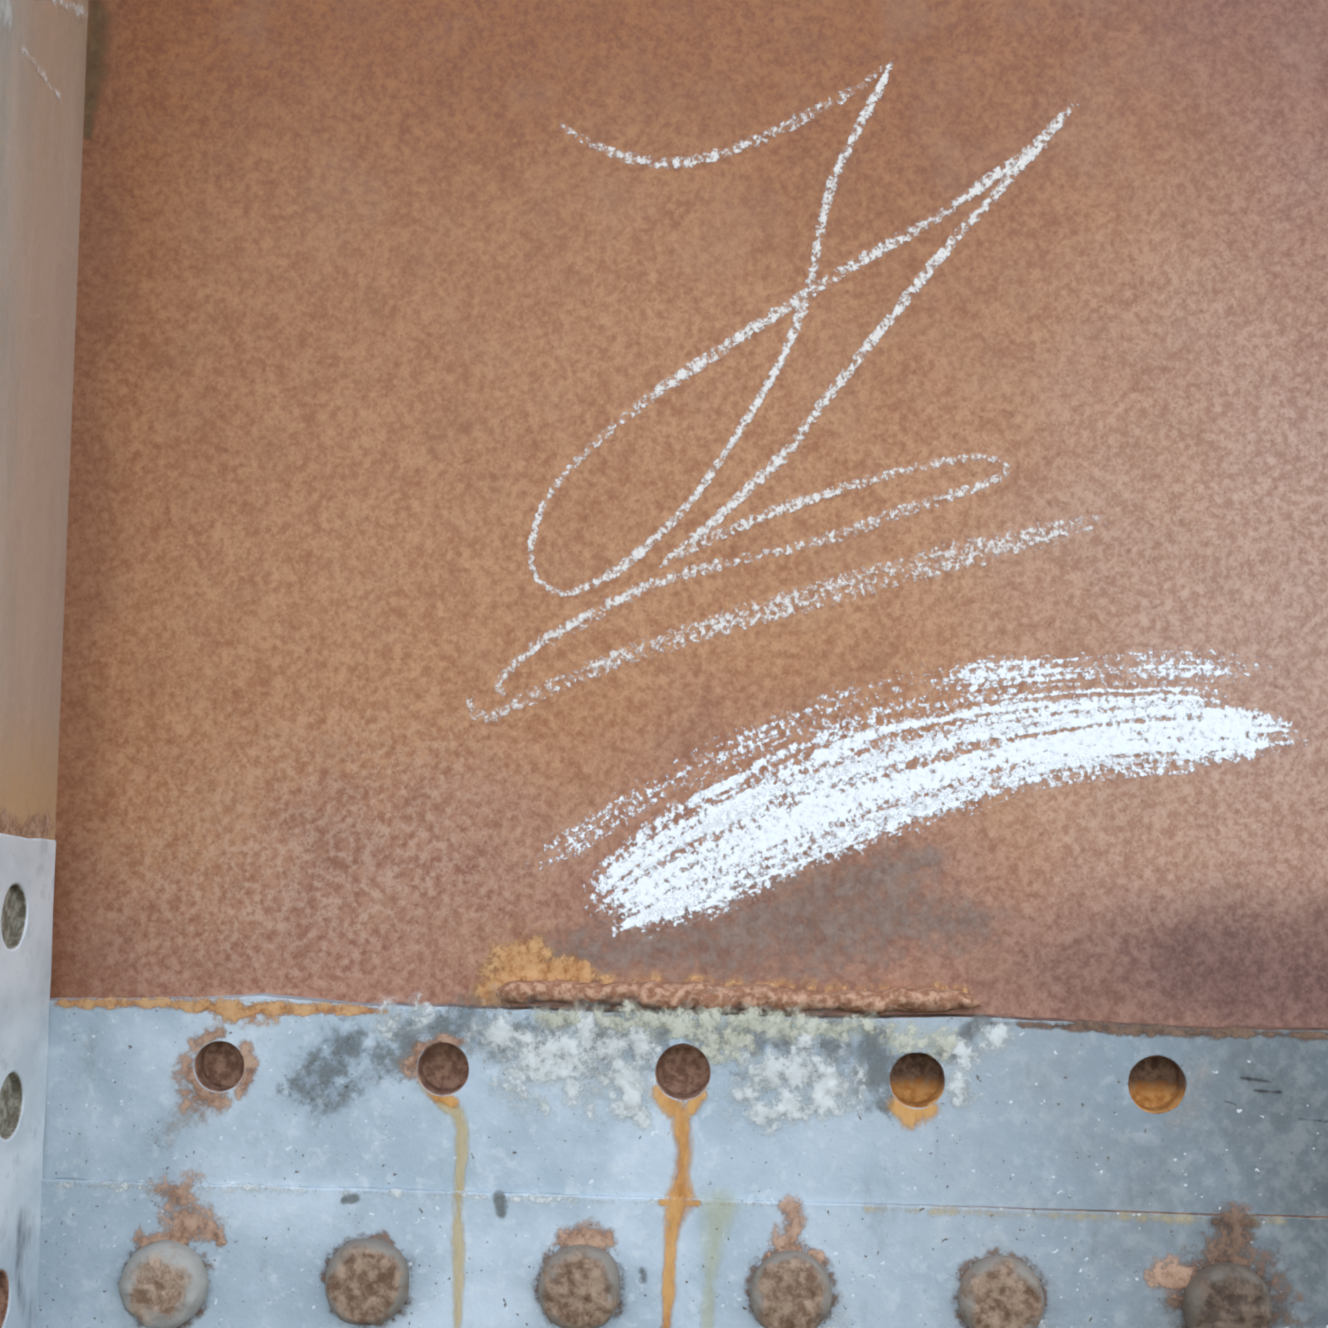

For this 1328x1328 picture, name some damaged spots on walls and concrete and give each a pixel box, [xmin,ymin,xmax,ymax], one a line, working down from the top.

rust [471,925,614,1006]
rust [55,997,388,1114]
efflorescence [279,995,1014,1134]
rust [120,1171,227,1278]
rust [400,1033,467,1328]
rust [652,1084,707,1328]
rust [745,1195,838,1322]
rust [1144,1202,1303,1328]